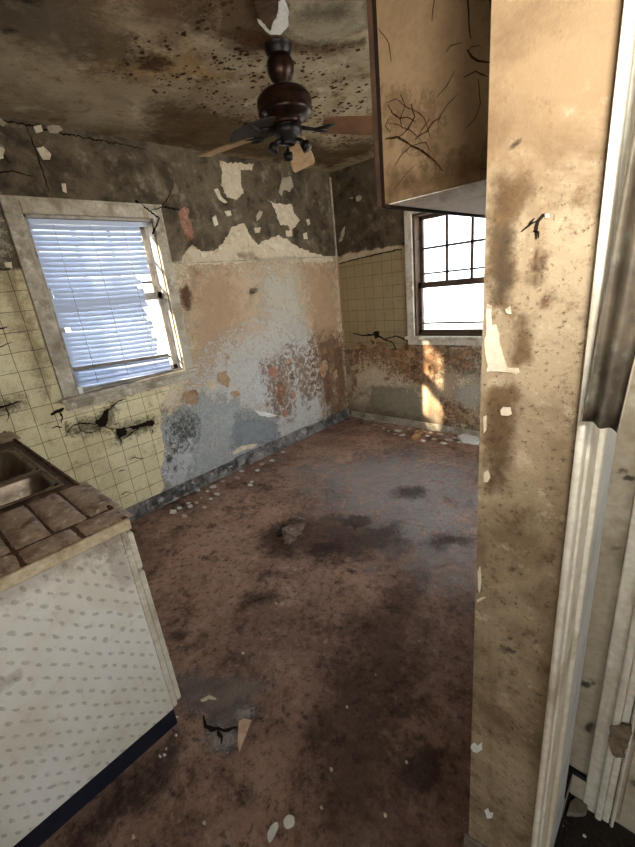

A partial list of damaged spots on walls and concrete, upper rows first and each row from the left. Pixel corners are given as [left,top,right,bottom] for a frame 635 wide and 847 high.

peeling [254,0,368,54]
crack [0,118,144,190]
damp [74,0,286,161]
peeling [212,161,254,226]
peeling [178,176,333,266]
damp [293,44,374,167]
damp [488,177,525,305]
crack [353,331,408,351]
peeling [344,304,519,434]
damp [514,320,530,363]
peeling [65,370,280,518]
damp [487,386,517,488]